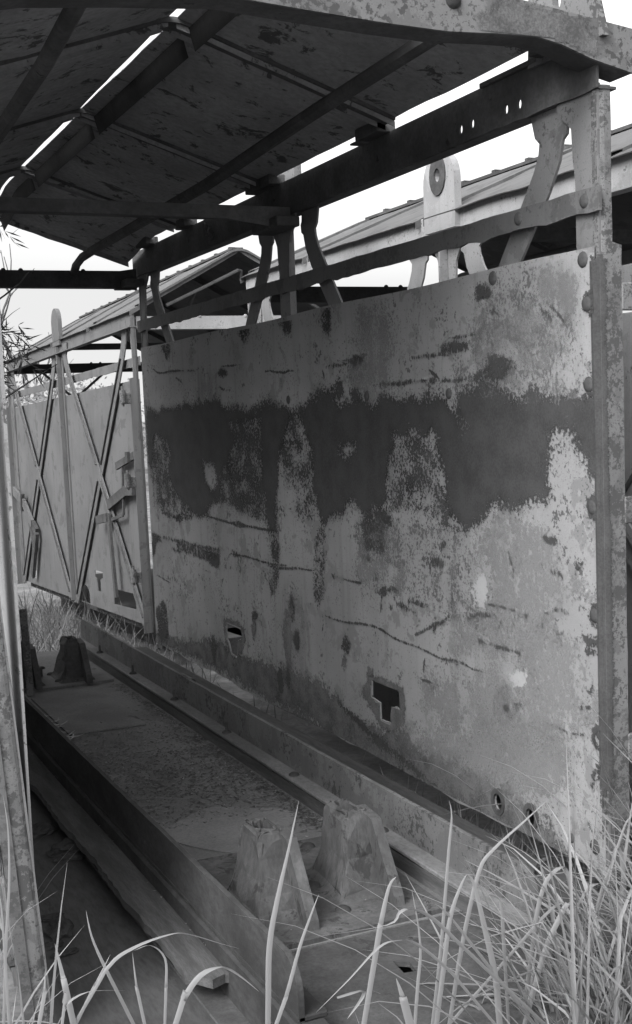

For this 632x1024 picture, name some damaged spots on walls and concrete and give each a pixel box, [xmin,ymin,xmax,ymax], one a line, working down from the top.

rust [473,0,602,58]
rust [145,254,619,824]
peeling [353,511,430,614]
peeling [404,503,599,809]